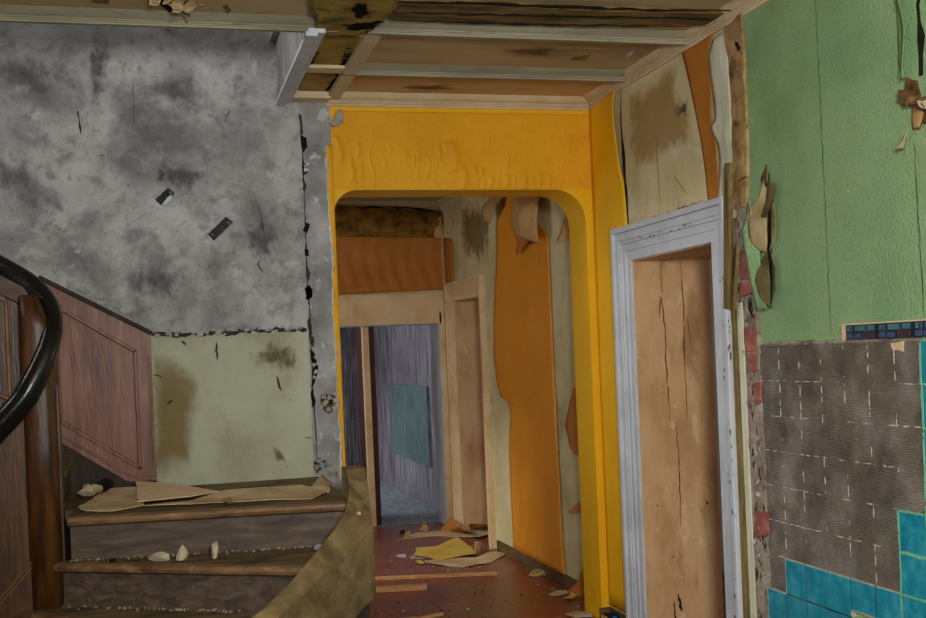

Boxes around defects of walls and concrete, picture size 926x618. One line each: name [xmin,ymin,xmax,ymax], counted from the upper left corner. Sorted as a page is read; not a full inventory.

peeling [298,0,398,92]
damp [266,349,294,366]
flaking render [313,146,342,480]
peeling [723,13,926,618]
damp [158,372,189,460]